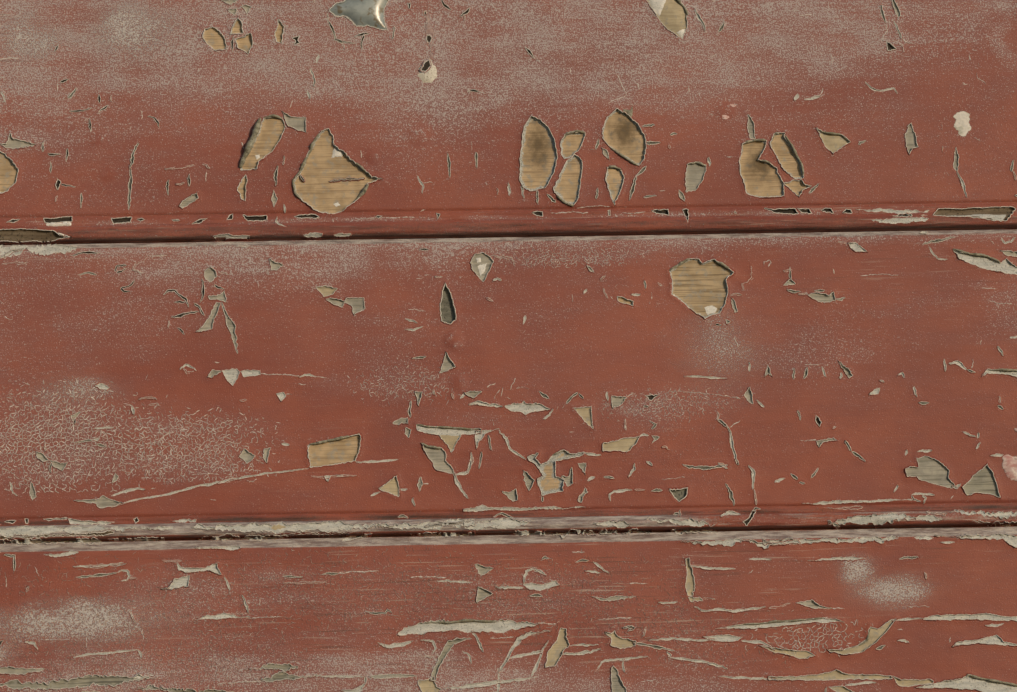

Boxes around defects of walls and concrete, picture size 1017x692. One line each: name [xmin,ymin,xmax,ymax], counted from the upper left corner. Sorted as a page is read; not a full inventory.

peeling [328,0,390,31]
peeling [236,111,383,215]
peeling [518,115,587,206]
peeling [601,105,648,207]
peeling [738,113,812,199]
peeling [669,257,735,325]
peeling [952,249,1017,275]
peeling [207,367,324,387]
peeling [0,416,1017,562]
peeling [0,599,844,692]
peeling [768,668,1017,692]
peeling [826,612,1017,656]